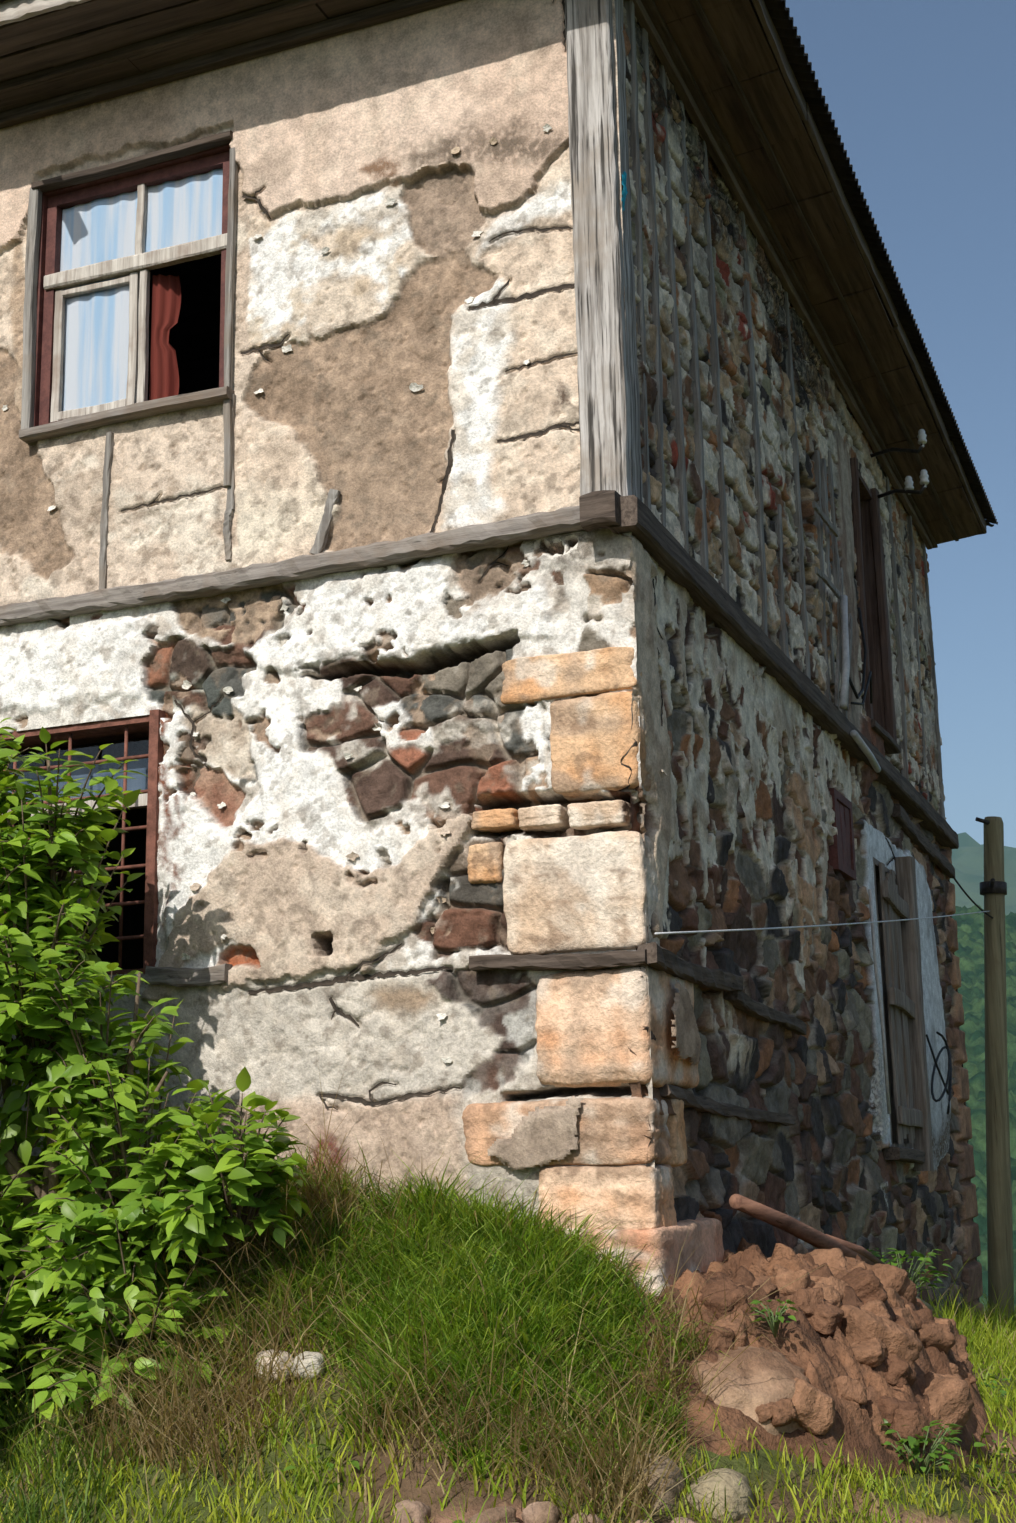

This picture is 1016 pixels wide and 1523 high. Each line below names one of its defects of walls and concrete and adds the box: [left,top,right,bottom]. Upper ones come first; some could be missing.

crack [242,187,271,219]
crack [489,226,573,242]
crack [468,279,575,310]
spalling [241,145,580,552]
crack [505,352,578,372]
spalling [0,213,75,580]
corrosion [158,713,178,902]
spalling [140,550,870,1094]
crack [319,1081,460,1110]